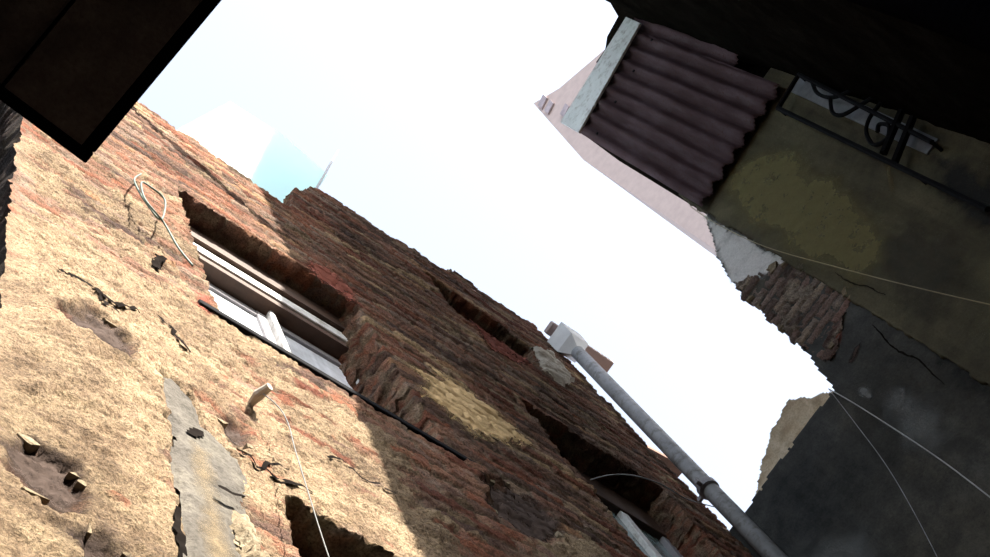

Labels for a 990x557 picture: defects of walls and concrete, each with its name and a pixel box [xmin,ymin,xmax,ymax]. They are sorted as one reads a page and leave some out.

peeling [704,152,885,361]
spalling [66,306,134,354]
crack [59,269,191,352]
crack [873,325,945,385]
spalling [217,418,254,456]
spalling [0,433,91,513]
spalling [70,522,132,557]
peeling [229,509,271,557]
spalling [483,475,565,542]